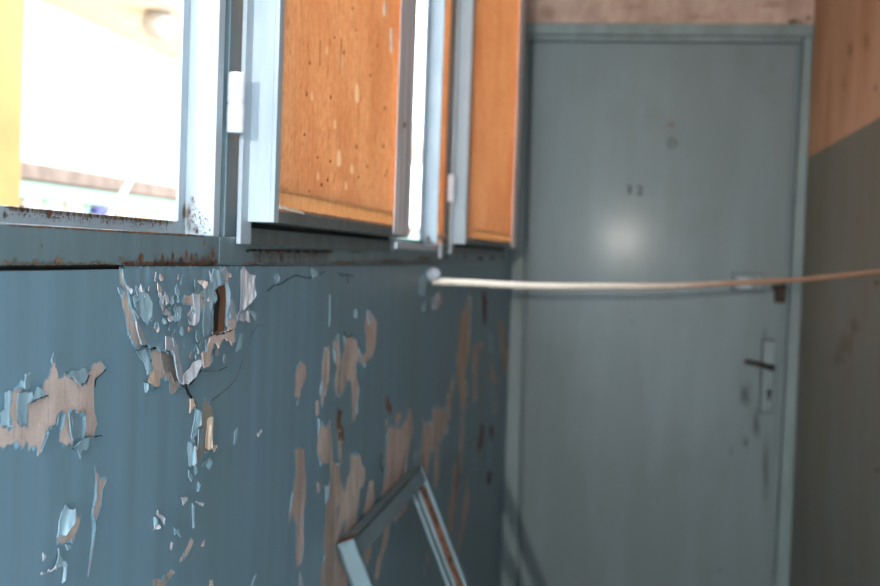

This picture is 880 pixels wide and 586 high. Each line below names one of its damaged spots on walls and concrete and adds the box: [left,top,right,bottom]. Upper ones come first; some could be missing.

rust [3,198,217,266]
crack [0,263,440,291]
peeling [0,353,106,459]
peeling [118,266,257,586]
crack [181,324,263,401]
peeling [288,292,509,586]
peeling [40,465,106,584]